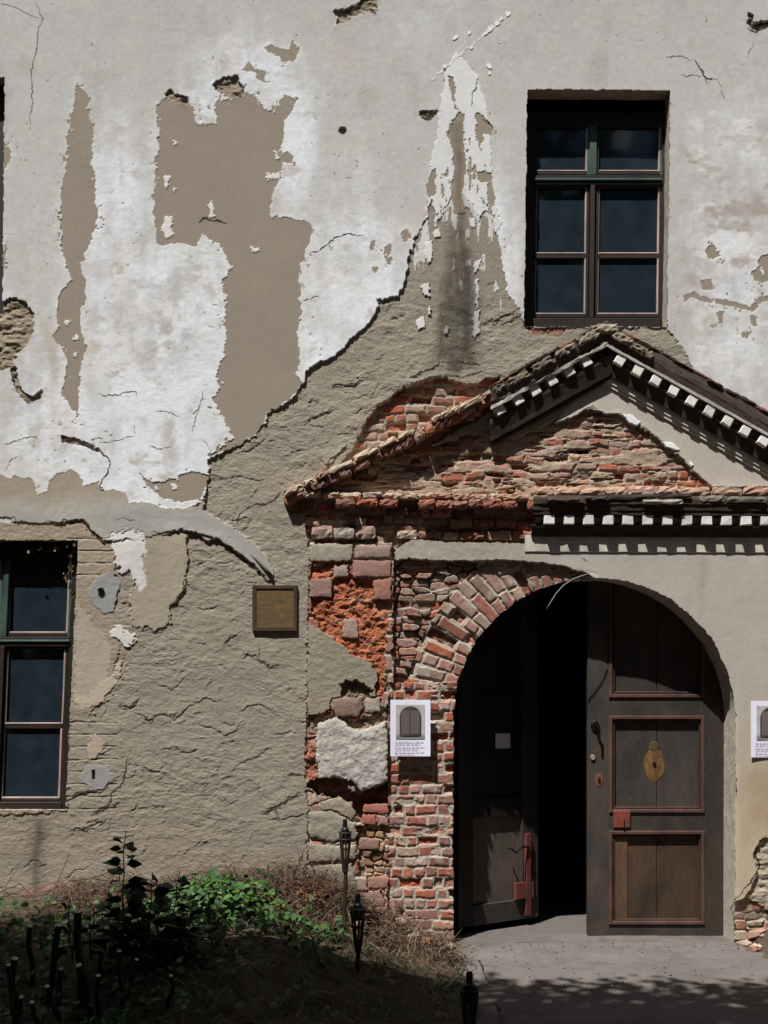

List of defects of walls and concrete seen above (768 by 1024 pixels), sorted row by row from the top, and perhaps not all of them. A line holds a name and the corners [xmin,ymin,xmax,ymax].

flaking render [334,0,378,24]
crack [4,4,43,129]
crack [667,55,725,98]
water stain [413,52,503,367]
peeling [705,241,726,265]
peeling [677,255,768,342]
flaking render [590,350,768,445]
flaking render [0,62,713,943]
crack [120,697,175,723]
crack [67,751,131,831]
crack [263,773,303,822]
flaking render [745,838,768,907]